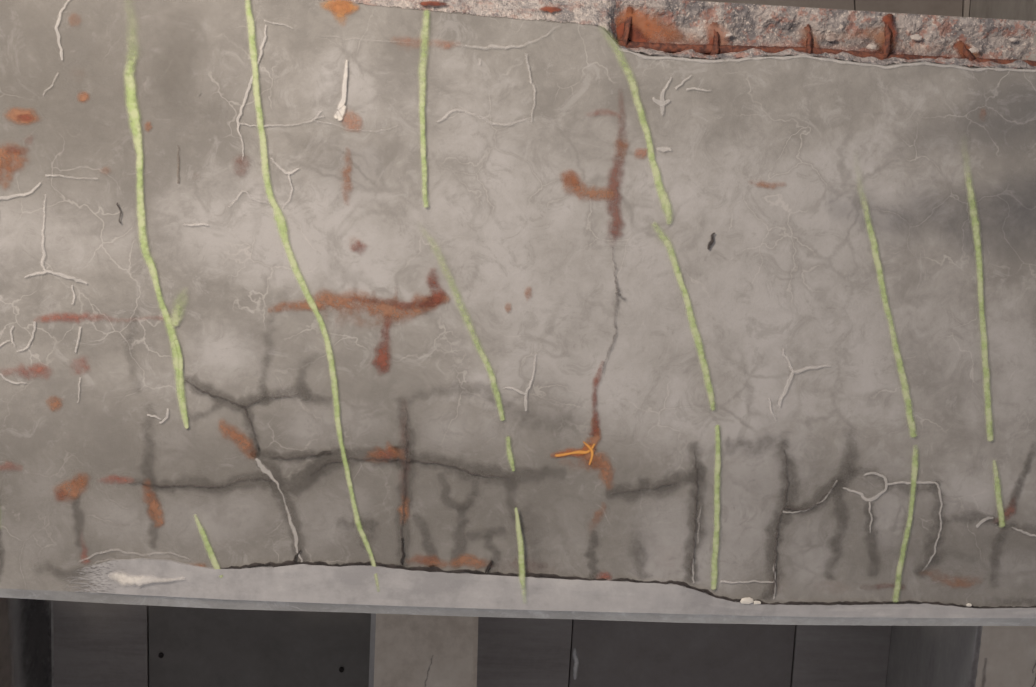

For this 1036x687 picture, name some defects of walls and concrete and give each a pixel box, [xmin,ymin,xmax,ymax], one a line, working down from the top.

rust [325,0,358,17]
spalling [322,0,1036,71]
rust [565,142,623,237]
rust [276,274,448,371]
crack [193,385,289,425]
crack [507,372,534,411]
crack [769,357,822,417]
crack [129,438,1036,608]
leakage [0,597,52,687]